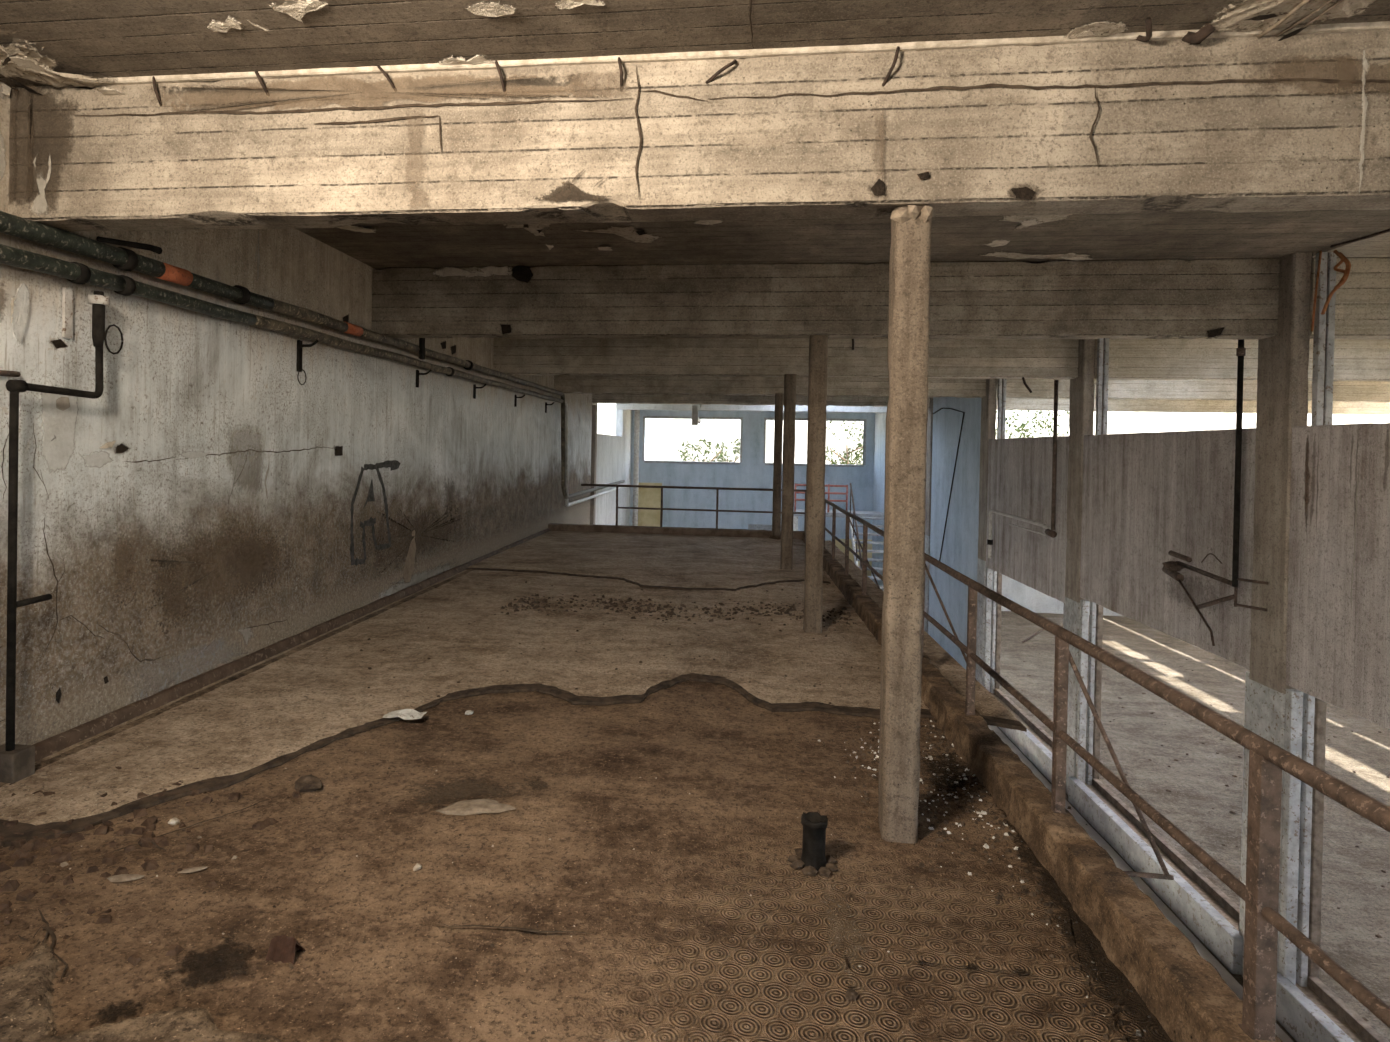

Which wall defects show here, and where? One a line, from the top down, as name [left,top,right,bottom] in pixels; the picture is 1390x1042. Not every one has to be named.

peeling [207,16,269,33]
peeling [269,0,328,22]
peeling [466,2,515,17]
crack [747,0,755,48]
spalling [1182,0,1376,45]
spalling [0,41,126,98]
spalling [576,226,660,251]
spalling [981,214,1092,261]
leakage [353,478,467,597]
leakage [108,512,297,628]